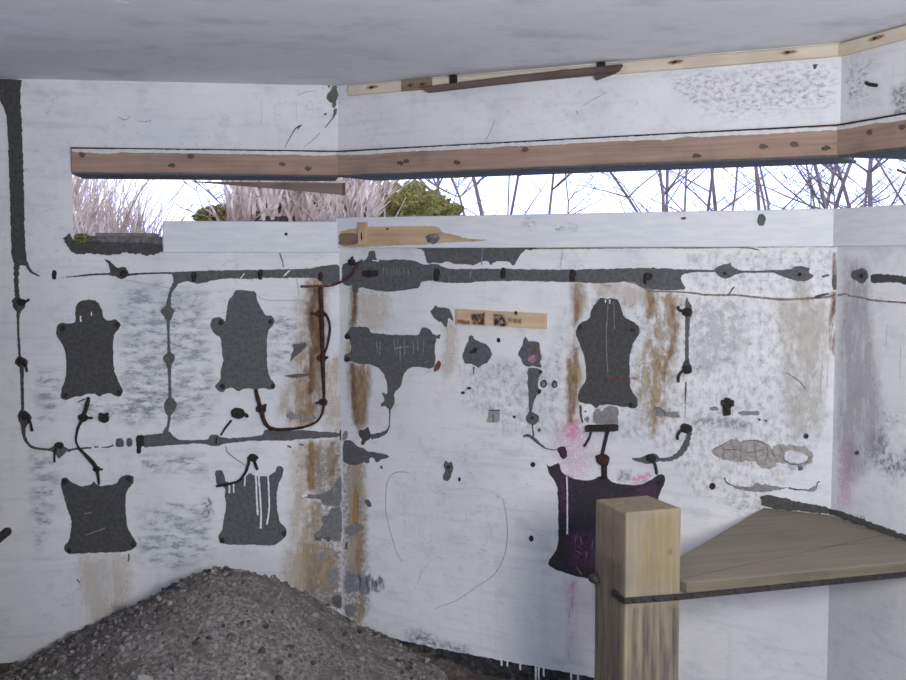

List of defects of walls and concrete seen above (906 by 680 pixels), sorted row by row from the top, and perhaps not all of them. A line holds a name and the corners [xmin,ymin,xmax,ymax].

peeling [38,461,203,562]
peeling [42,291,204,410]
peeling [176,290,306,416]
corrosion [282,287,324,424]
corrosion [349,290,357,327]
corrosion [350,364,369,426]
peeling [293,305,453,617]
corrosion [568,352,581,422]
peeling [513,336,665,579]
peeling [576,298,640,424]
corrosion [639,292,678,434]
damp [841,267,906,471]